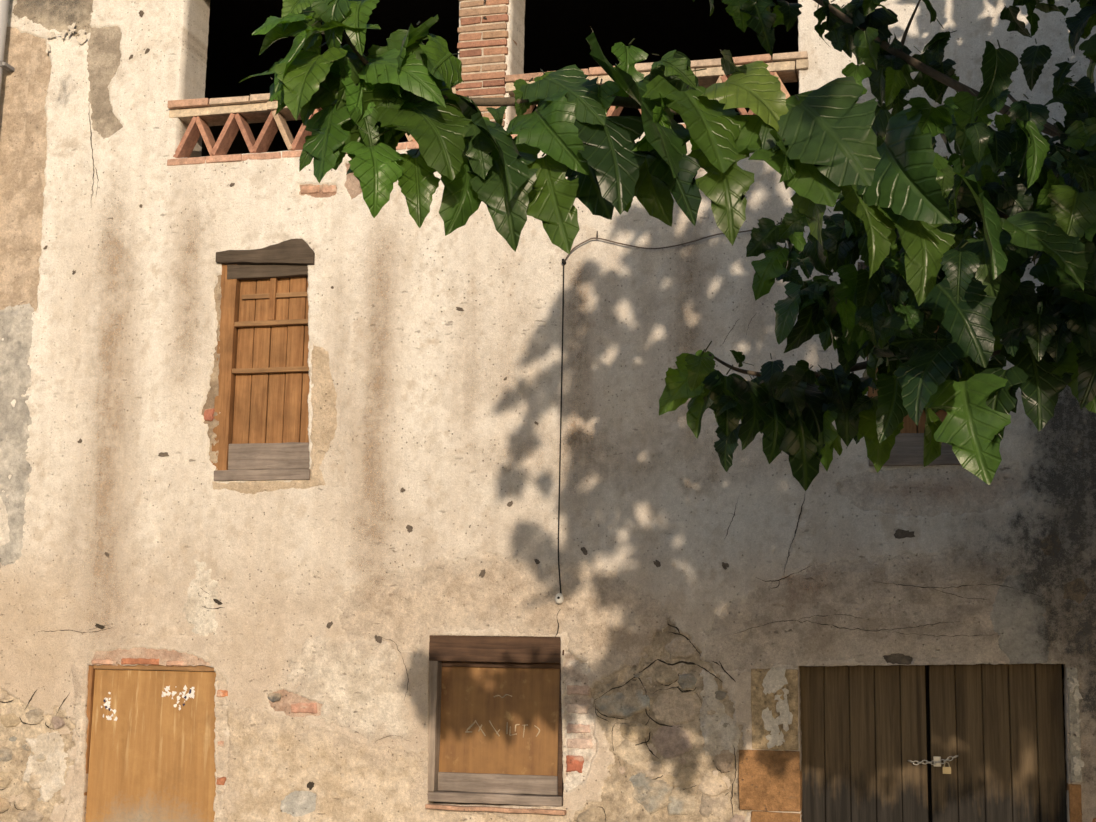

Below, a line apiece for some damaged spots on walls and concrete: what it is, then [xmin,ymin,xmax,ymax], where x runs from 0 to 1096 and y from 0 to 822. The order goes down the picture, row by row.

flaking render [0,0,150,311]
flaking render [91,647,571,822]
flaking render [326,547,676,792]
crack [756,497,812,589]
flaking render [701,547,1024,749]
crack [738,581,1043,637]
flaking render [836,463,1029,539]
water stain [1007,385,1096,732]